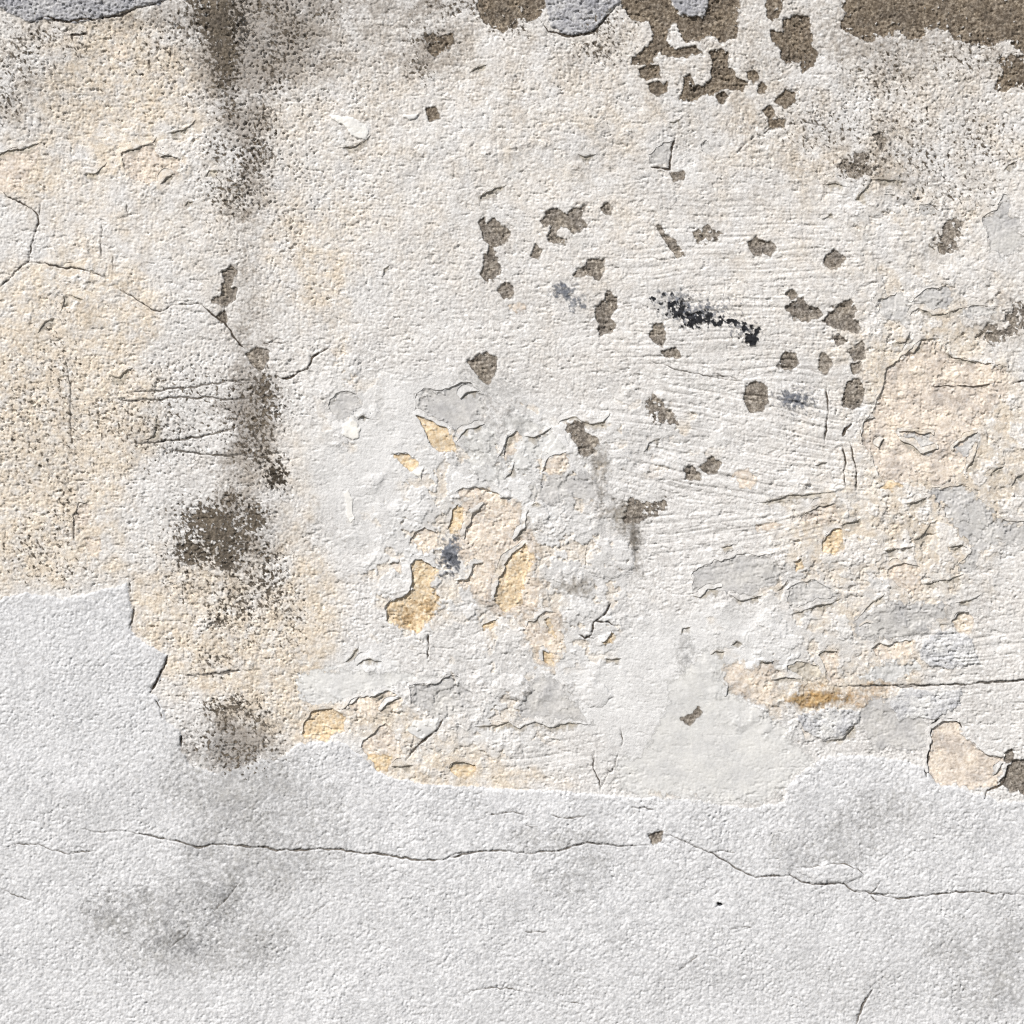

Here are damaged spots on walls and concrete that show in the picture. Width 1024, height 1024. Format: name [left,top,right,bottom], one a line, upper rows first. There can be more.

spalling [621,0,796,129]
spalling [765,0,818,74]
spalling [840,0,1024,92]
crack [2,197,127,285]
spalling [476,184,526,313]
crack [119,379,262,458]
crack [824,392,857,488]
water stain [0,294,308,836]
peeling [380,351,610,674]
peeling [785,283,1024,795]
crack [135,833,633,861]
crack [666,835,1012,901]